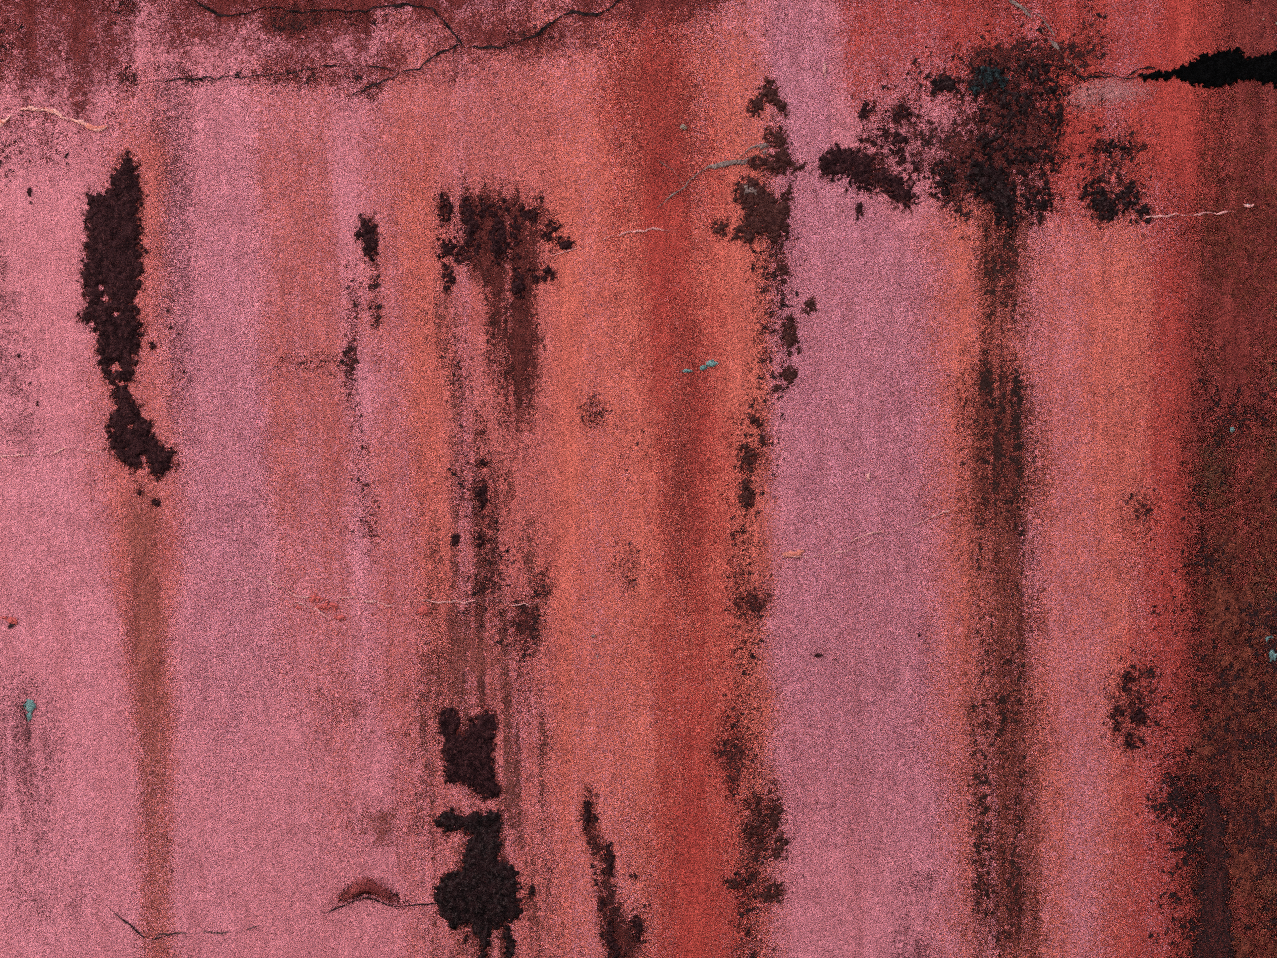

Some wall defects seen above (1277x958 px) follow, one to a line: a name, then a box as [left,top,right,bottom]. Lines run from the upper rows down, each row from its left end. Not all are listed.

rust [72,61,200,958]
crack [143,0,621,96]
rust [232,0,794,958]
rust [826,0,1277,958]
crack [1009,0,1175,80]
spalling [1138,47,1277,89]